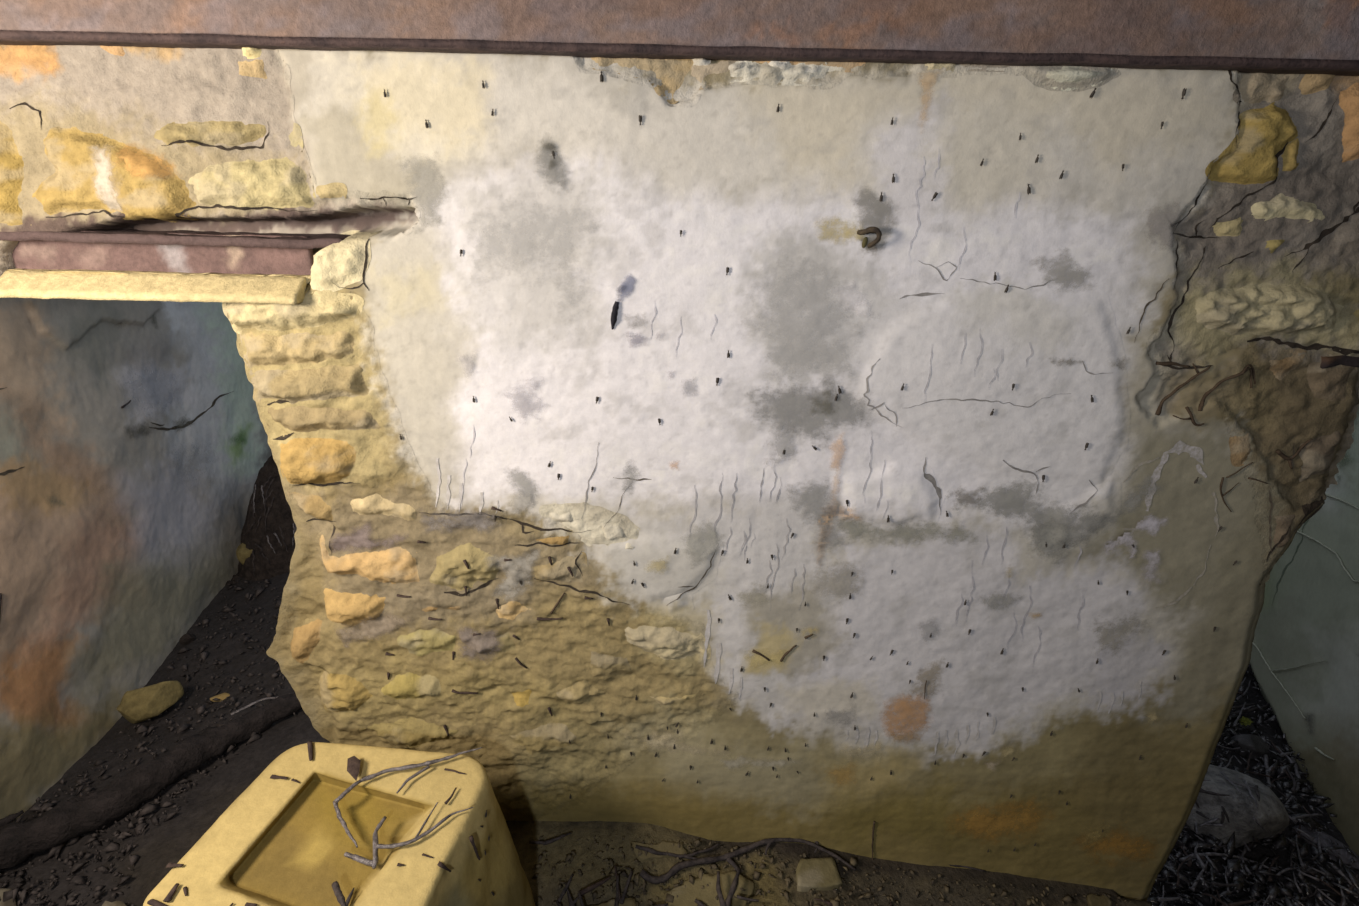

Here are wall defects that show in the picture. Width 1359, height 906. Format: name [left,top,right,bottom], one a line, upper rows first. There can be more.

water stain [539,143,566,186]
water stain [823,191,895,250]
crack [1134,98,1359,370]
crack [267,400,294,440]
flaking render [0,45,741,821]
water stain [479,472,536,513]
crack [419,442,652,605]
water stain [743,381,968,611]
crack [923,458,942,515]
crack [863,359,1104,427]
water stain [956,484,1166,663]
flaking render [1146,70,1359,586]